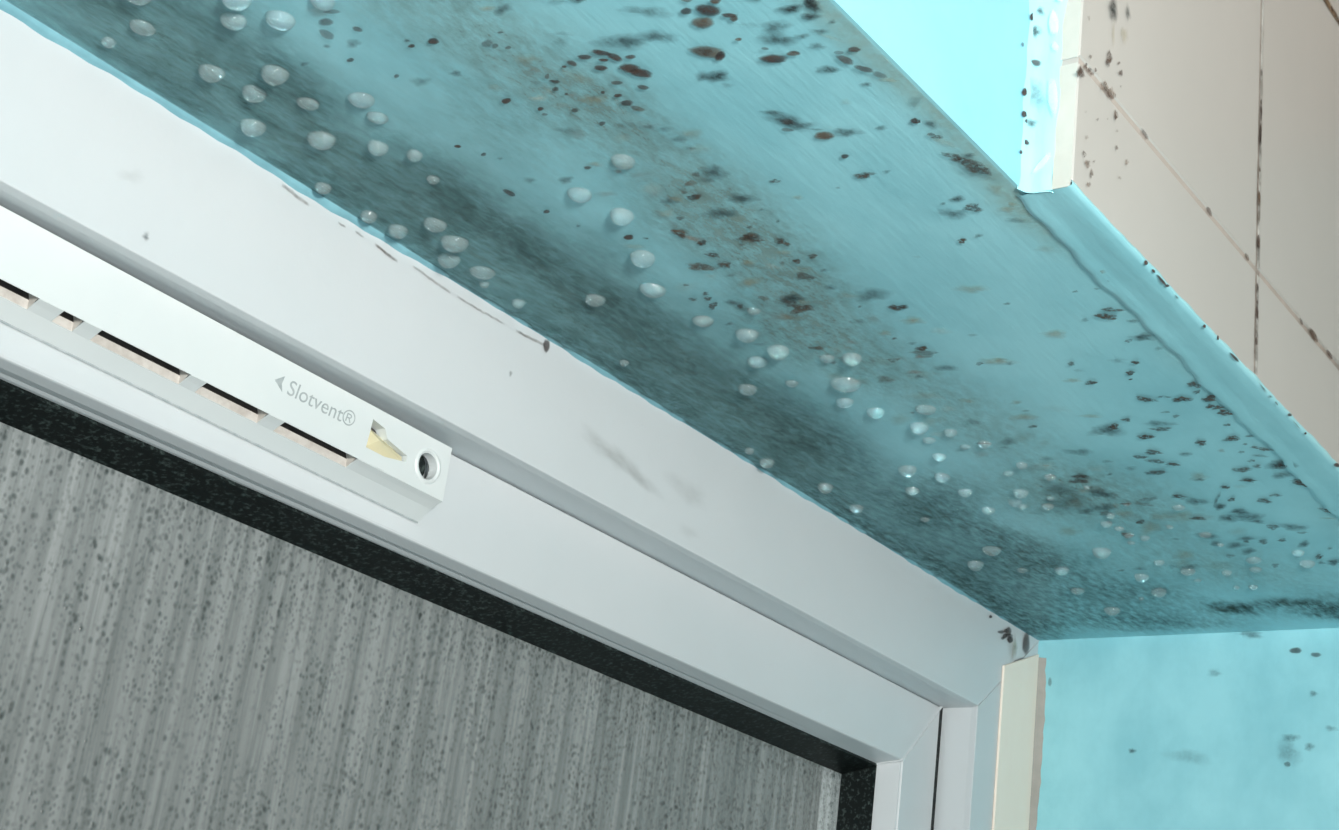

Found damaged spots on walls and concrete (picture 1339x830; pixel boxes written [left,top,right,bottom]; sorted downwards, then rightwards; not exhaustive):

damp [1022,0,1061,46]
damp [1078,51,1123,119]
damp [944,154,990,174]
damp [1246,100,1262,260]
damp [53,0,890,476]
damp [1095,308,1132,322]
damp [1040,475,1130,515]
damp [1134,382,1306,556]
damp [920,502,1135,661]
damp [1211,600,1339,619]